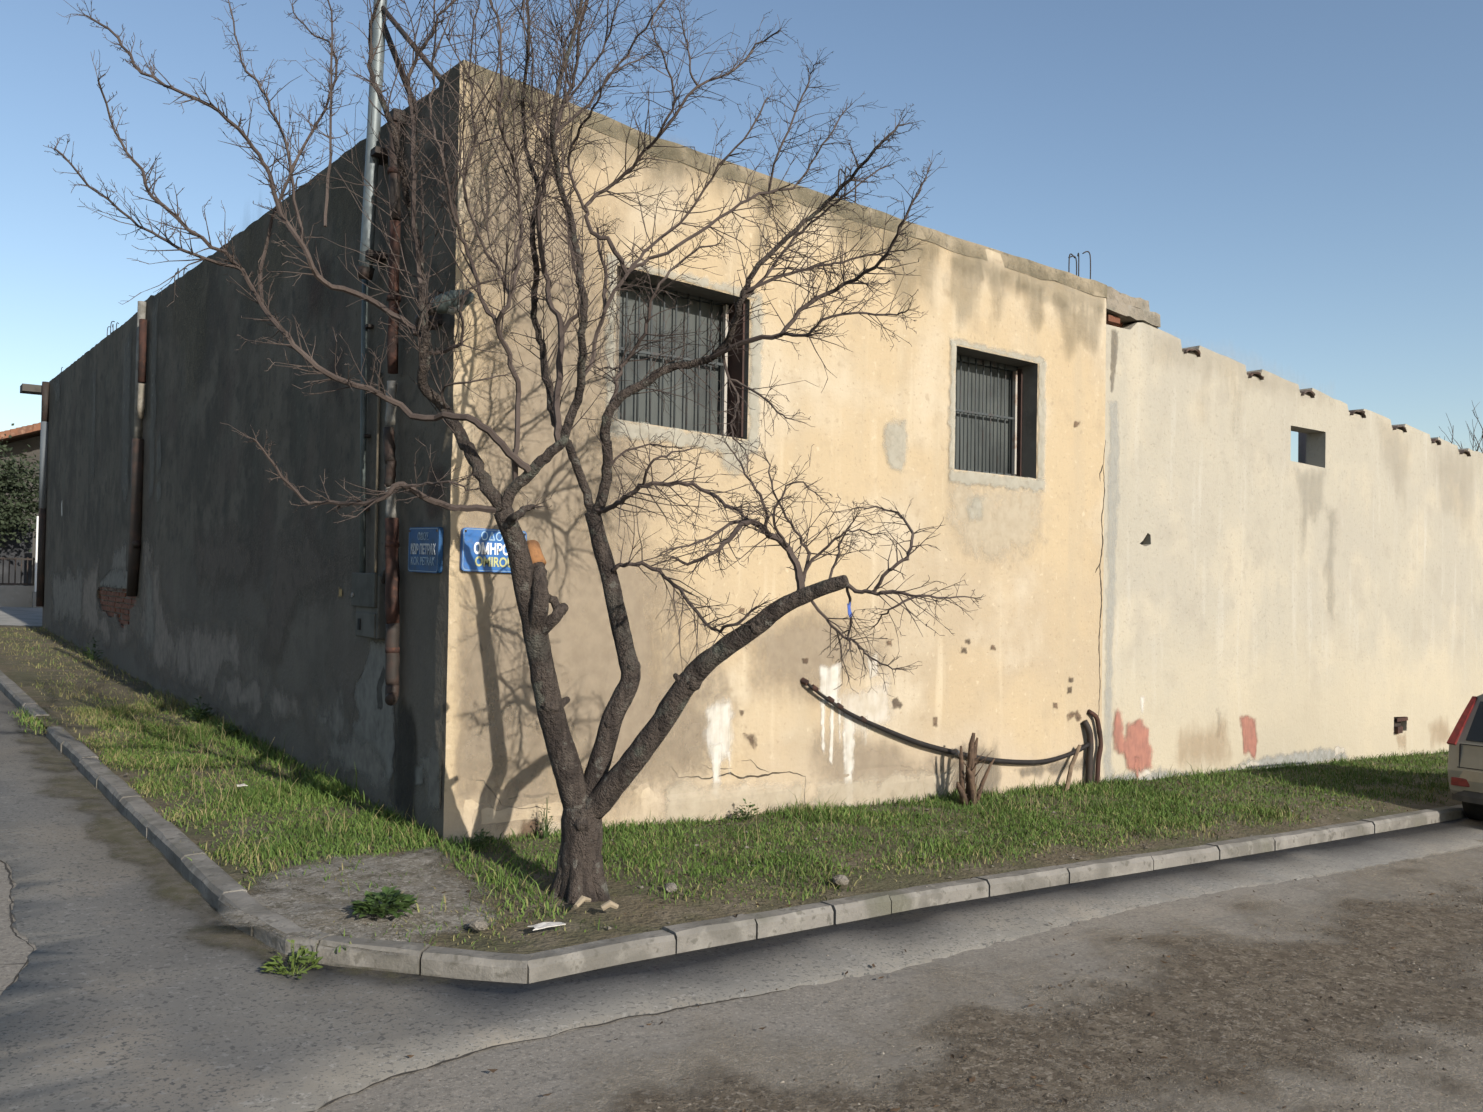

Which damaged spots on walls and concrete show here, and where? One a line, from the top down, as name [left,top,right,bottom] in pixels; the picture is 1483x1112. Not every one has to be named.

leakage [462,113,680,771]
leakage [760,618,846,686]
leakage [665,708,730,785]
leakage [821,700,867,791]